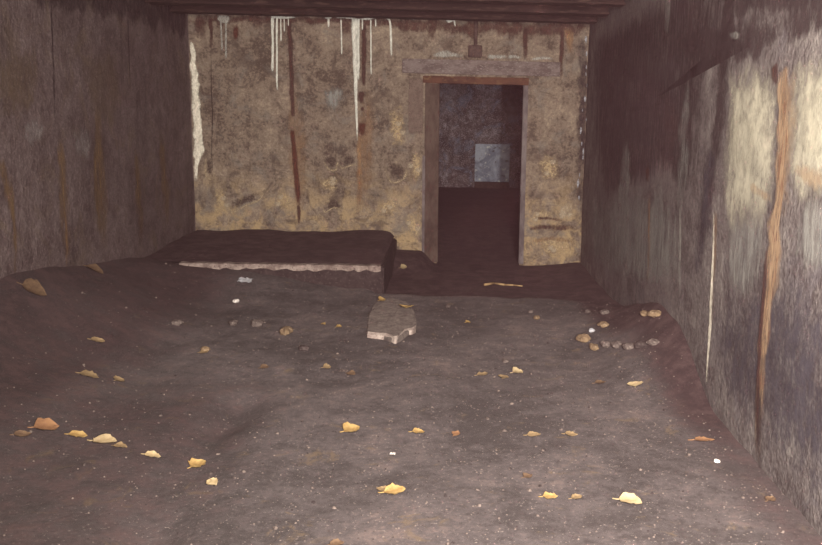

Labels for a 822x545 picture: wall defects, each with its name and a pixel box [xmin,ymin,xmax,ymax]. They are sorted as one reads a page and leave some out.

leakage [190,43,204,178]
rust [287,22,295,116]
rust [358,25,367,110]
leakage [195,14,583,134]
rust [291,131,301,221]
rust [755,64,788,446]